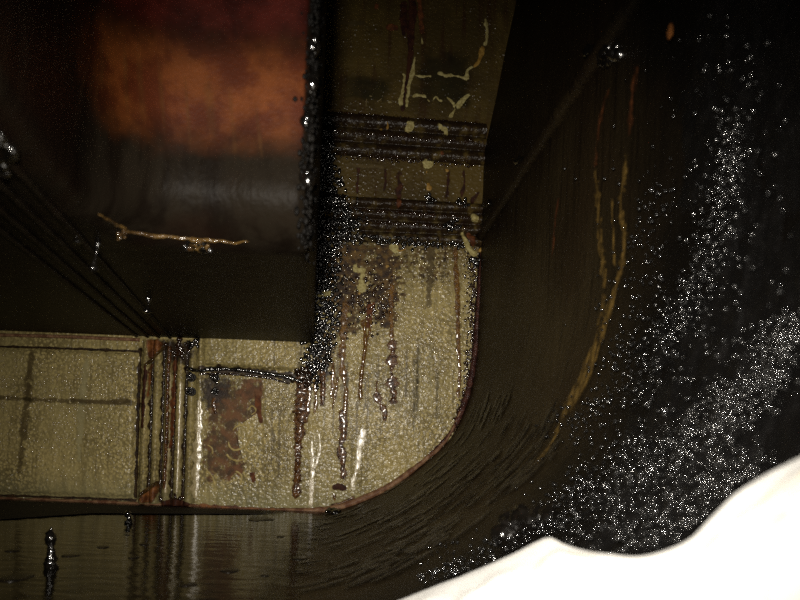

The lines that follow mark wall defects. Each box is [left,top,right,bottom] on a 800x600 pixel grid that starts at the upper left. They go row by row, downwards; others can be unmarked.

rust [141,339,166,428]
rust [169,357,177,448]
rust [202,379,266,485]